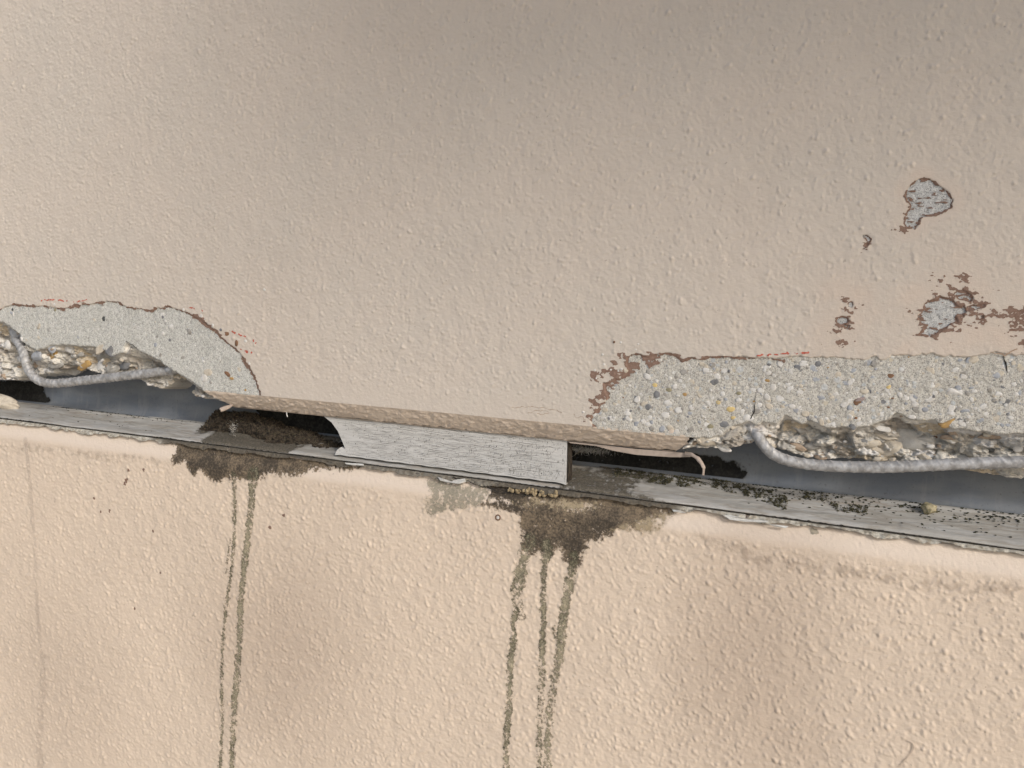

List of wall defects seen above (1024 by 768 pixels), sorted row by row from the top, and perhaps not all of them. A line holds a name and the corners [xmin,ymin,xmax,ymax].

peeling [891,177,953,234]
spalling [0,301,261,412]
spalling [0,394,1024,555]
spalling [569,272,1024,479]
leakage [170,443,360,768]
leakage [427,480,674,768]